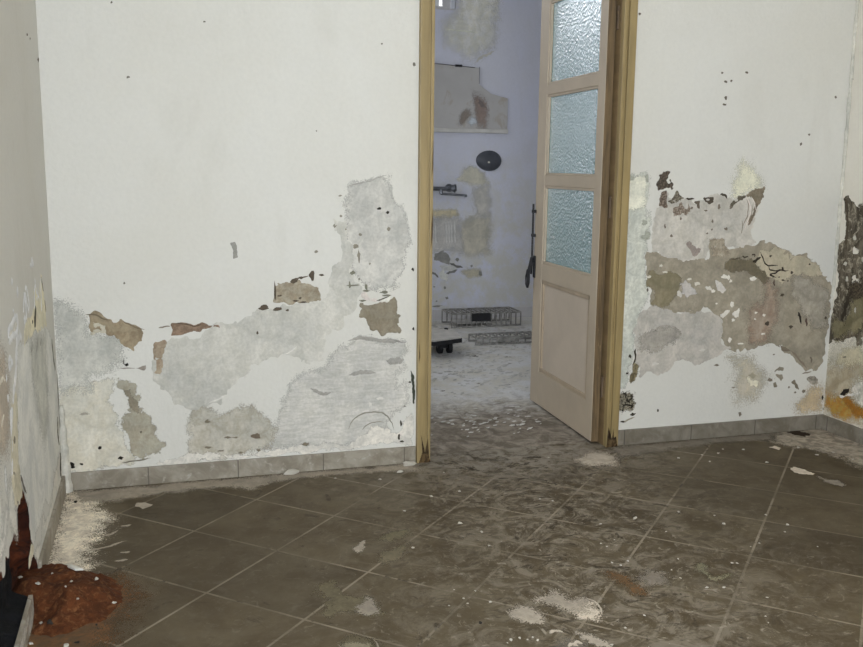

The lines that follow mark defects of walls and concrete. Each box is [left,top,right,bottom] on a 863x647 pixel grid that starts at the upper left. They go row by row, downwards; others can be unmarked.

damp [0,345,18,563]
peeling [0,275,60,647]
spalling [85,311,144,351]
damp [34,298,414,560]
peeling [121,175,414,410]
spalling [431,216,482,307]
peeling [633,171,832,378]
damp [714,195,863,427]
spalling [840,380,863,407]
damp [27,519,154,647]